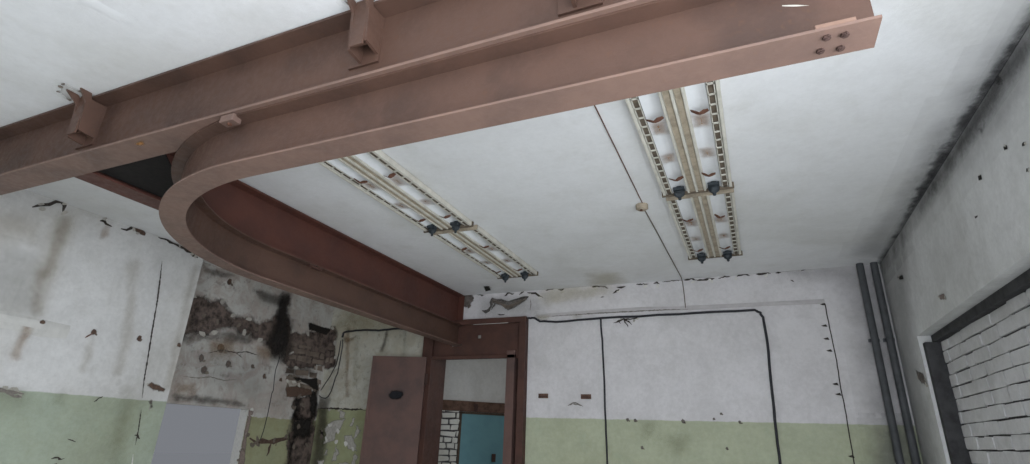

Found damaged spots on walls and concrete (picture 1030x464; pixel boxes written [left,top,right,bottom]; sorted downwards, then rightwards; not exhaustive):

water stain [880,50,1022,262]
spalling [180,295,361,464]
peeling [464,286,531,315]